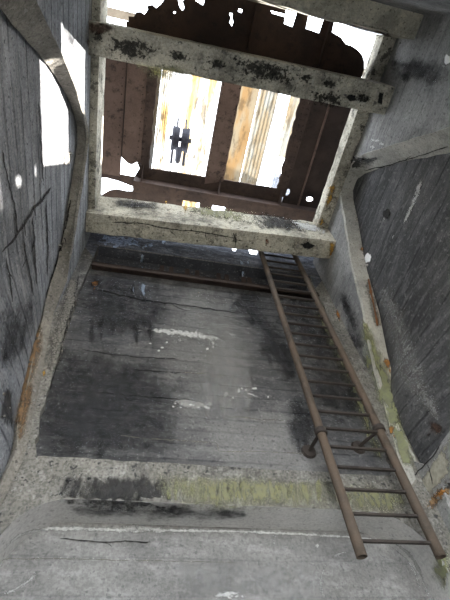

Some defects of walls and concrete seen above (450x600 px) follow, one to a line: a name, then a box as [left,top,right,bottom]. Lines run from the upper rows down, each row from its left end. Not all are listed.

mould [109,37,157,62]
mould [208,57,311,86]
damp [392,60,437,80]
mould [311,80,347,108]
crack [2,102,71,302]
crack [112,222,242,245]
damp [83,278,220,352]
rust [15,328,42,439]
damp [42,353,163,449]
damp [288,404,312,445]
damp [62,475,245,518]
crack [60,538,202,562]